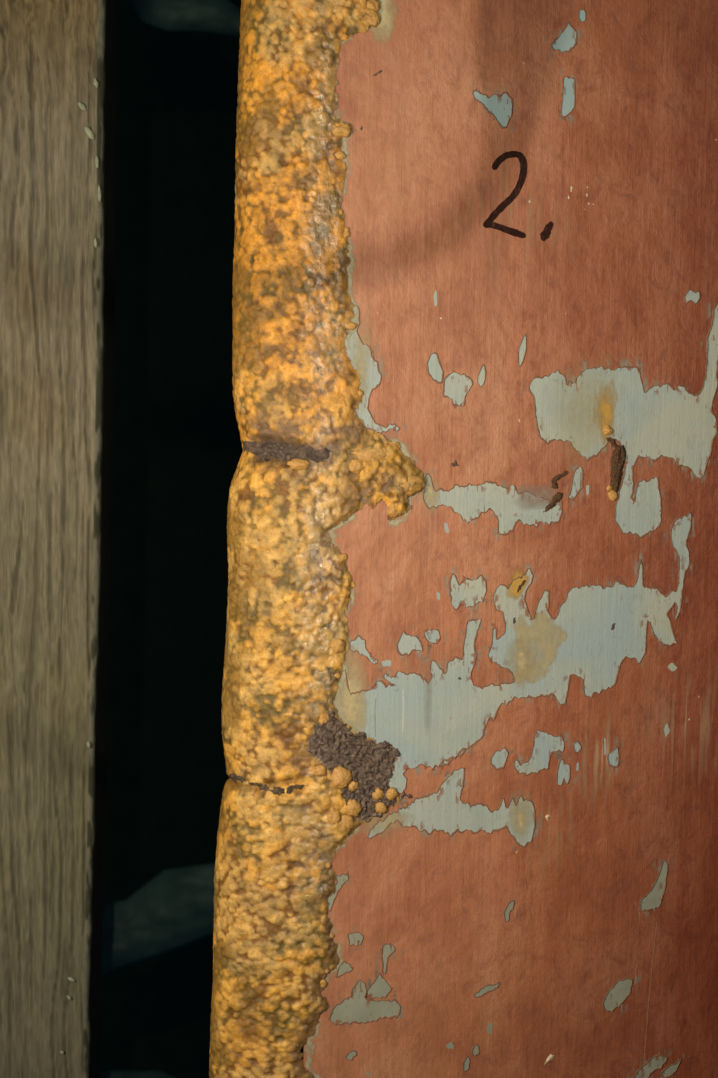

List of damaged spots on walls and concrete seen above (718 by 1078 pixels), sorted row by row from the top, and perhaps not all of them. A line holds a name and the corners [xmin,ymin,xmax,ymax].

peeling [472,88,515,129]
peeling [684,289,700,304]
peeling [342,242,415,460]
corrosion [599,395,613,438]
corrosion [209,0,438,1078]
peeling [329,303,718,854]
peeling [639,860,668,916]
peeling [304,932,403,1078]
peeling [603,975,637,1012]